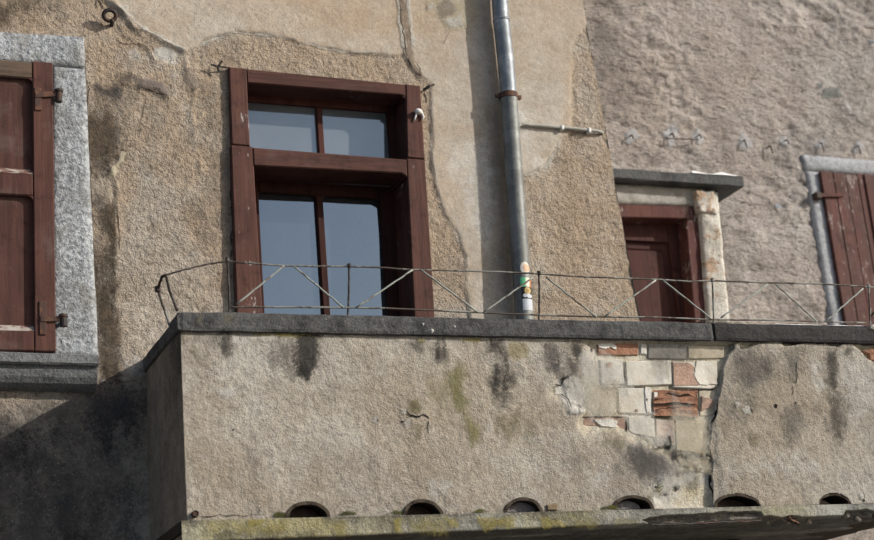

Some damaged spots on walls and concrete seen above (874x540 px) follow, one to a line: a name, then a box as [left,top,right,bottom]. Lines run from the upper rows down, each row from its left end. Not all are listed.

crack [397,0,427,103]
water stain [88,108,127,177]
water stain [98,202,118,261]
water stain [292,334,322,380]
water stain [490,338,513,406]
spalling [555,343,724,464]
water stain [826,351,838,387]
crack [706,399,718,505]
spalling [653,473,677,504]